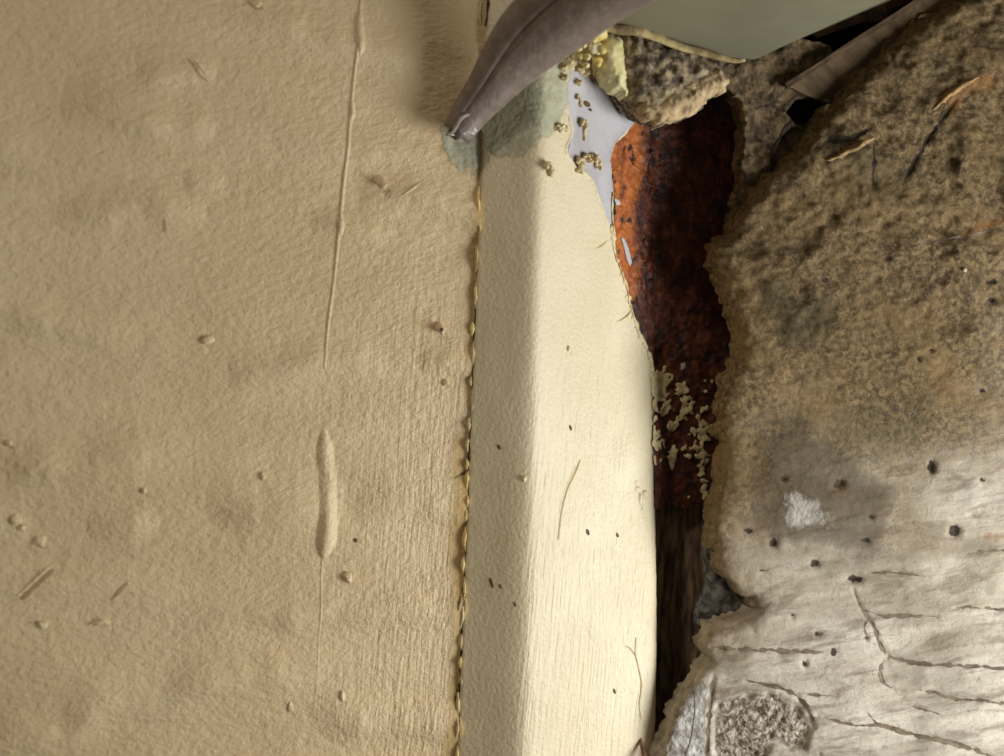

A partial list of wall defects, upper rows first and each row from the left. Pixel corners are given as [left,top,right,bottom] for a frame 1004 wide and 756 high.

peeling [565,70,716,500]
rust [611,95,737,511]
crack [705,680,714,756]
crack [717,646,823,654]
crack [748,594,1004,756]
crack [873,569,919,577]